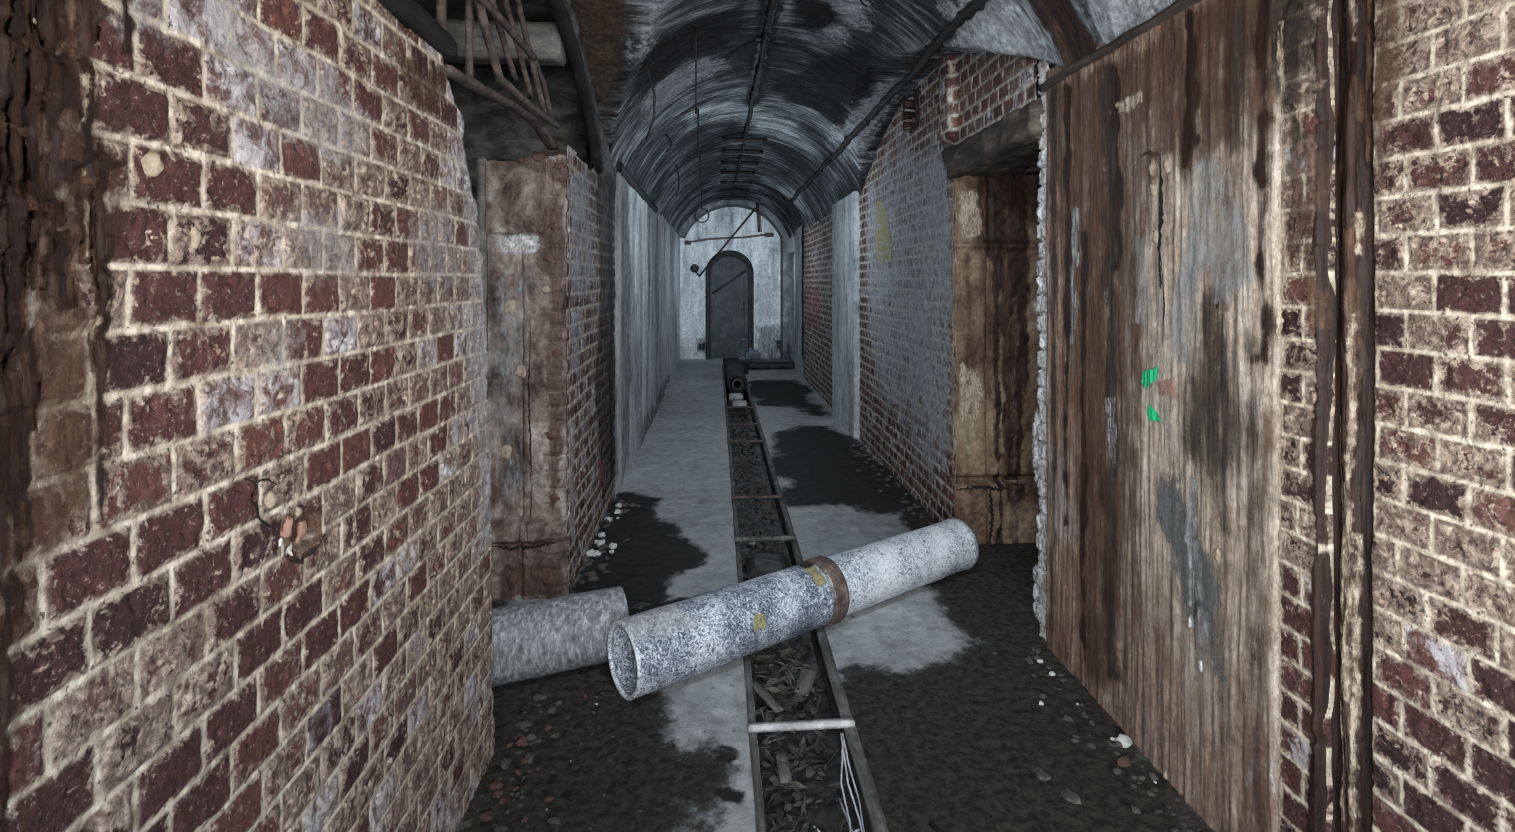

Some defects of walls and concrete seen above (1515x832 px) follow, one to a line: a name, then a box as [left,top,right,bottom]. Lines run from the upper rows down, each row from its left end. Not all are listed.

spalling [33,0,107,41]
damp [573,0,632,124]
damp [639,29,729,83]
damp [774,86,845,124]
spalling [264,491,322,556]
damp [569,175,708,616]
damp [749,380,938,530]
damp [838,154,1215,832]
damp [1156,160,1253,685]
damp [1273,0,1312,832]